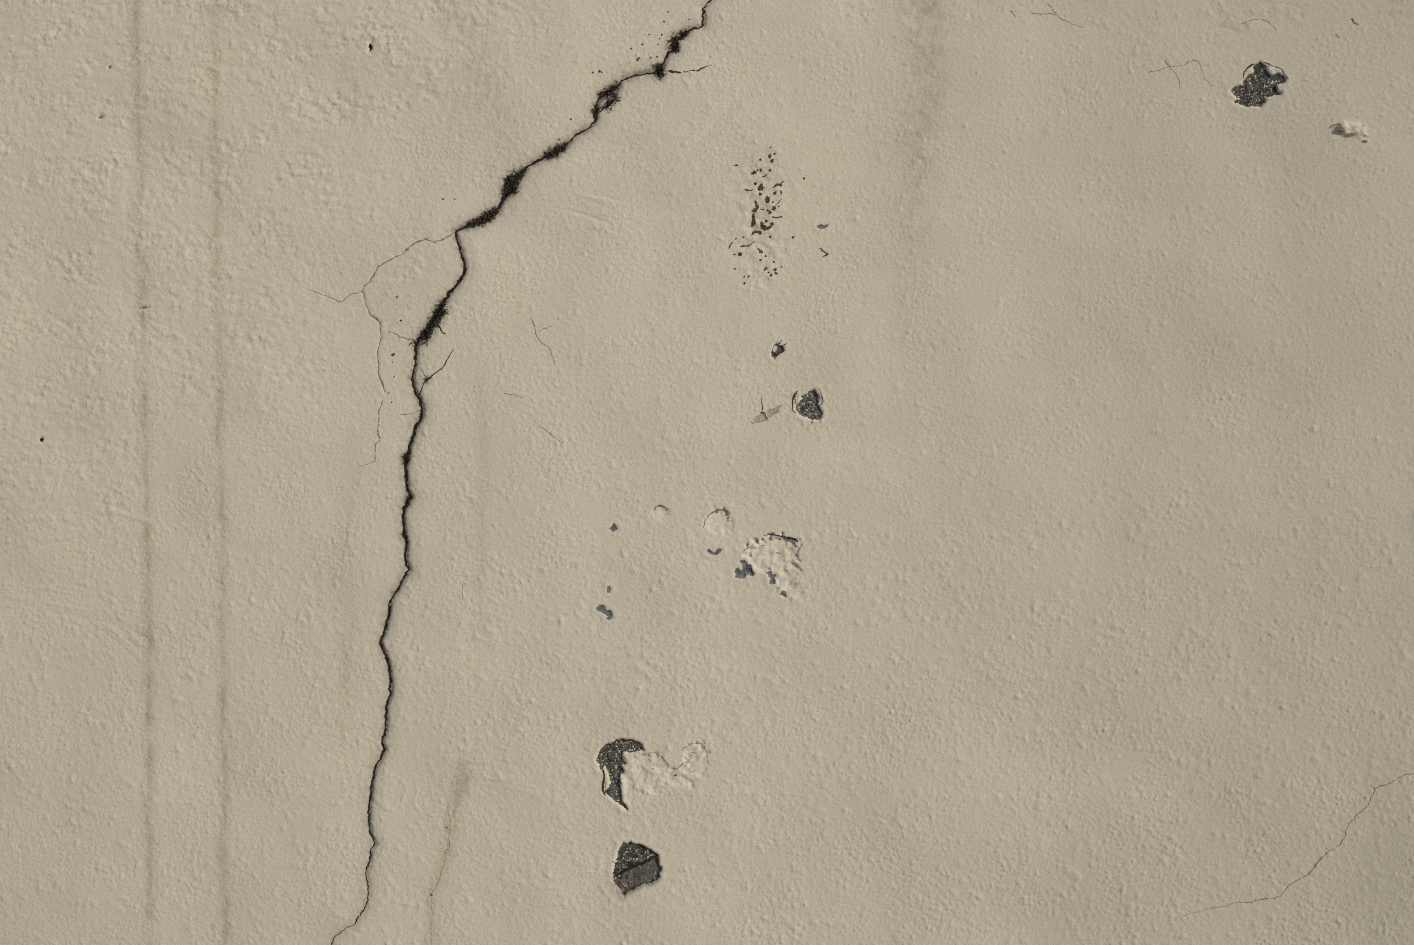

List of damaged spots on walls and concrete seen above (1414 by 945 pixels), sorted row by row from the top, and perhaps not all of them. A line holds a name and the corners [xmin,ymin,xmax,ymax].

spalling [1231,62,1289,107]
spalling [750,389,824,423]
crack [313,0,712,945]
spalling [708,525,808,609]
spalling [596,734,717,818]
spalling [613,842,661,895]